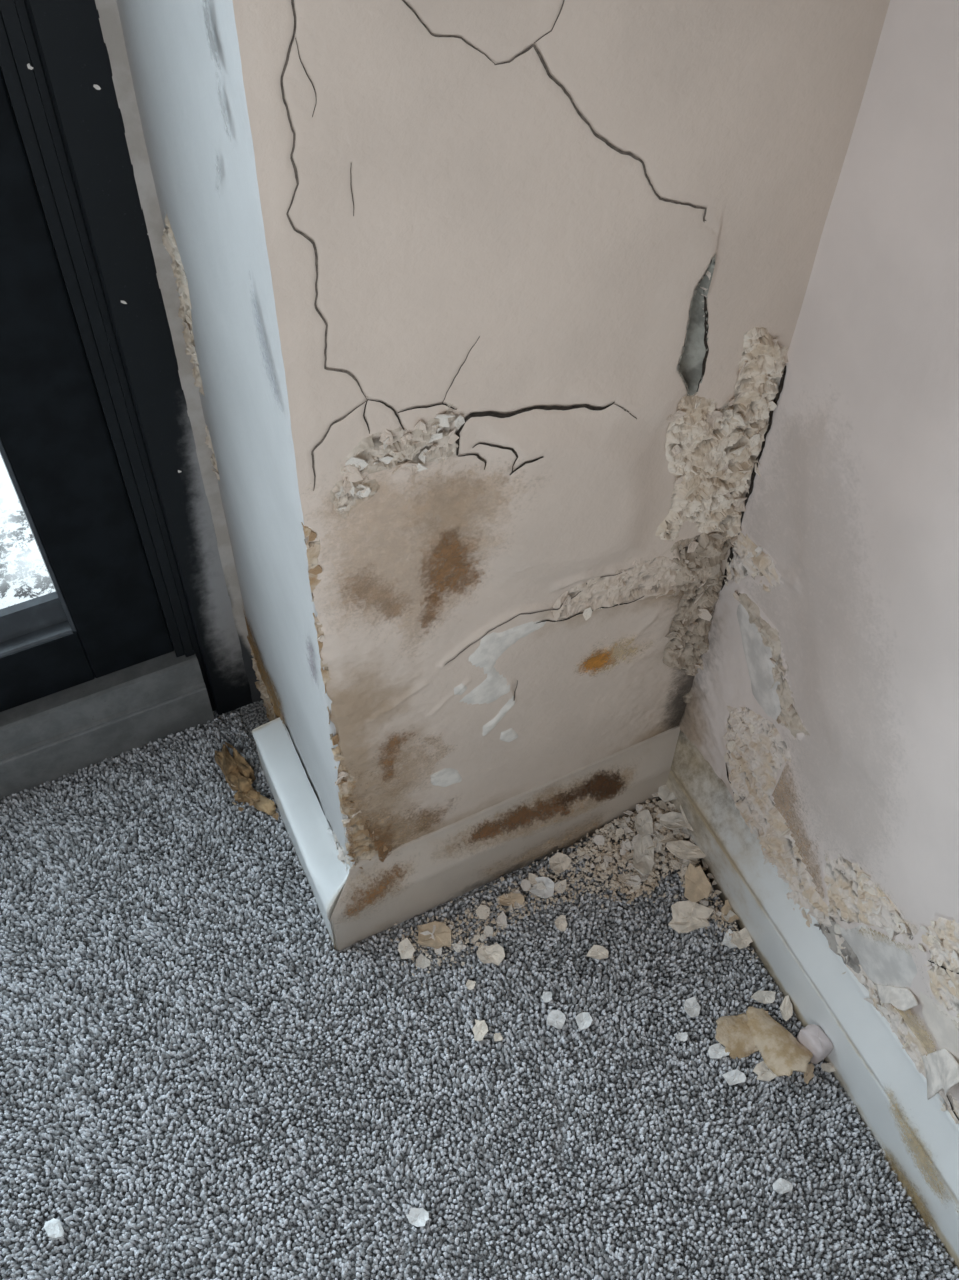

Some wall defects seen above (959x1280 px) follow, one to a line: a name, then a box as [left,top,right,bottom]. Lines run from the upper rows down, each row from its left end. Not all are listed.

crack [402,0,707,223]
crack [280,0,637,491]
crack [697,296,709,391]
flaking render [330,402,465,519]
corrosion [584,642,637,672]
flaking render [454,254,959,1123]
damp [340,782,439,862]
damp [382,733,411,779]
flaking render [430,768,462,787]
flaking render [398,785,753,969]